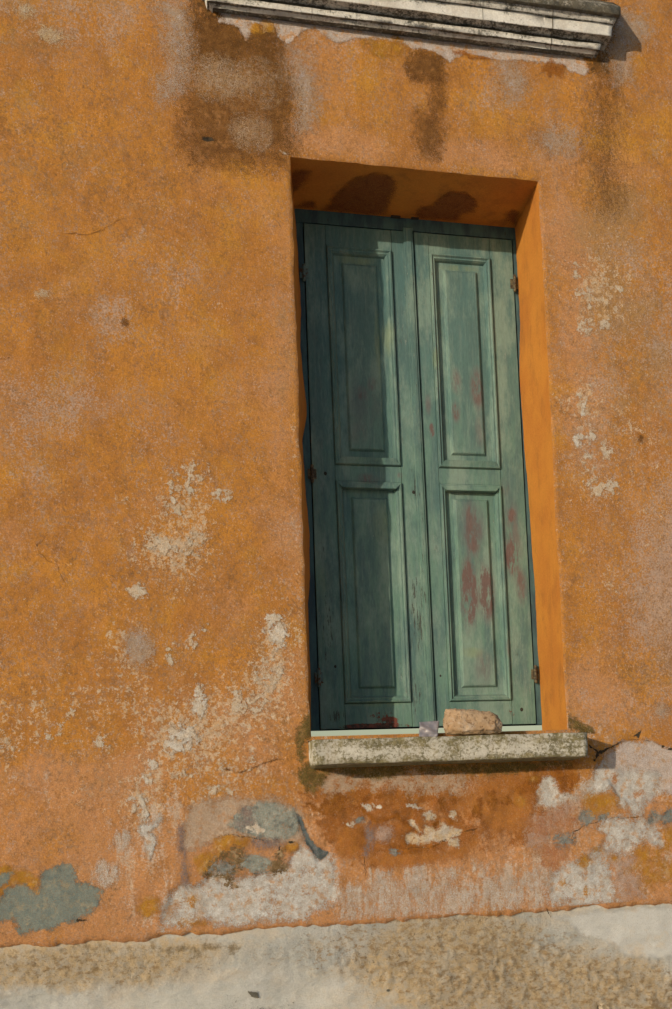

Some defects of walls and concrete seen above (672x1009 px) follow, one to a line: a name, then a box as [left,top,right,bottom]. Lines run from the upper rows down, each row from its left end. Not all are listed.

damp [146,0,398,216]
damp [401,48,451,163]
damp [522,5,660,224]
peeling [142,459,212,564]
peeling [211,488,233,504]
peeling [44,704,76,740]
peeling [157,683,210,755]
crack [588,739,668,761]
peeling [89,758,164,889]
flaking render [132,813,343,932]
flaking render [365,803,481,870]
flaking render [536,731,672,906]